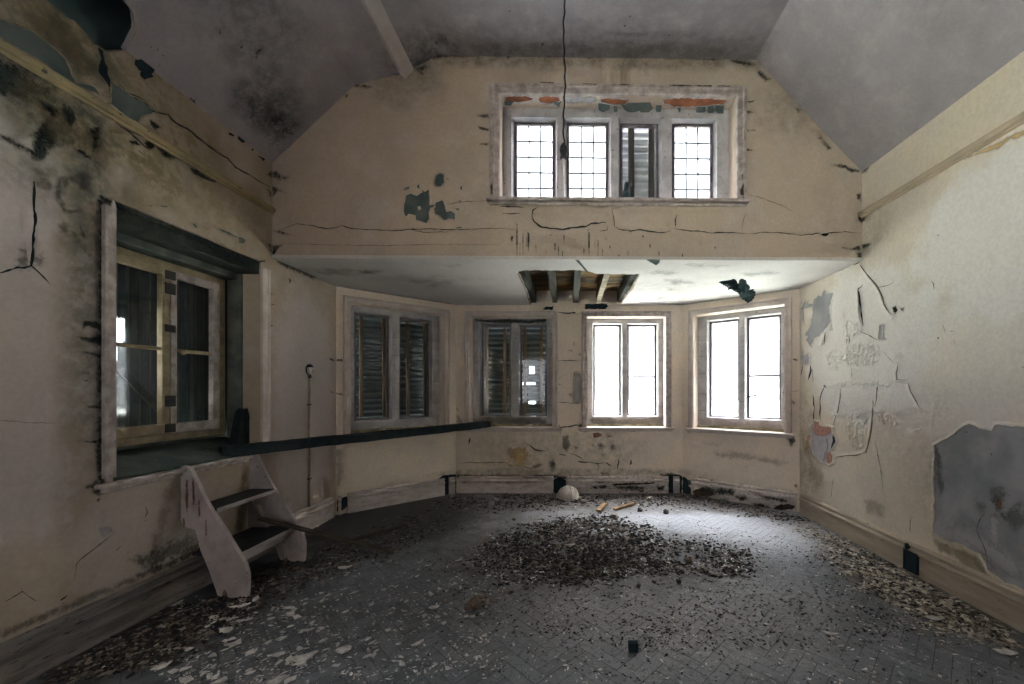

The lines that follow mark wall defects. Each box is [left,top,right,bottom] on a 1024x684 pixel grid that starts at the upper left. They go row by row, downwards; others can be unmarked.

leakage [0,60,76,159]
peeling [0,17,157,124]
leakage [130,141,171,159]
crack [112,76,273,187]
peeling [598,84,730,114]
crack [0,181,50,284]
peeling [402,172,463,228]
crack [276,194,854,246]
peeling [800,289,835,367]
crack [830,262,923,499]
spalling [807,419,839,467]
flaking render [930,420,1024,592]